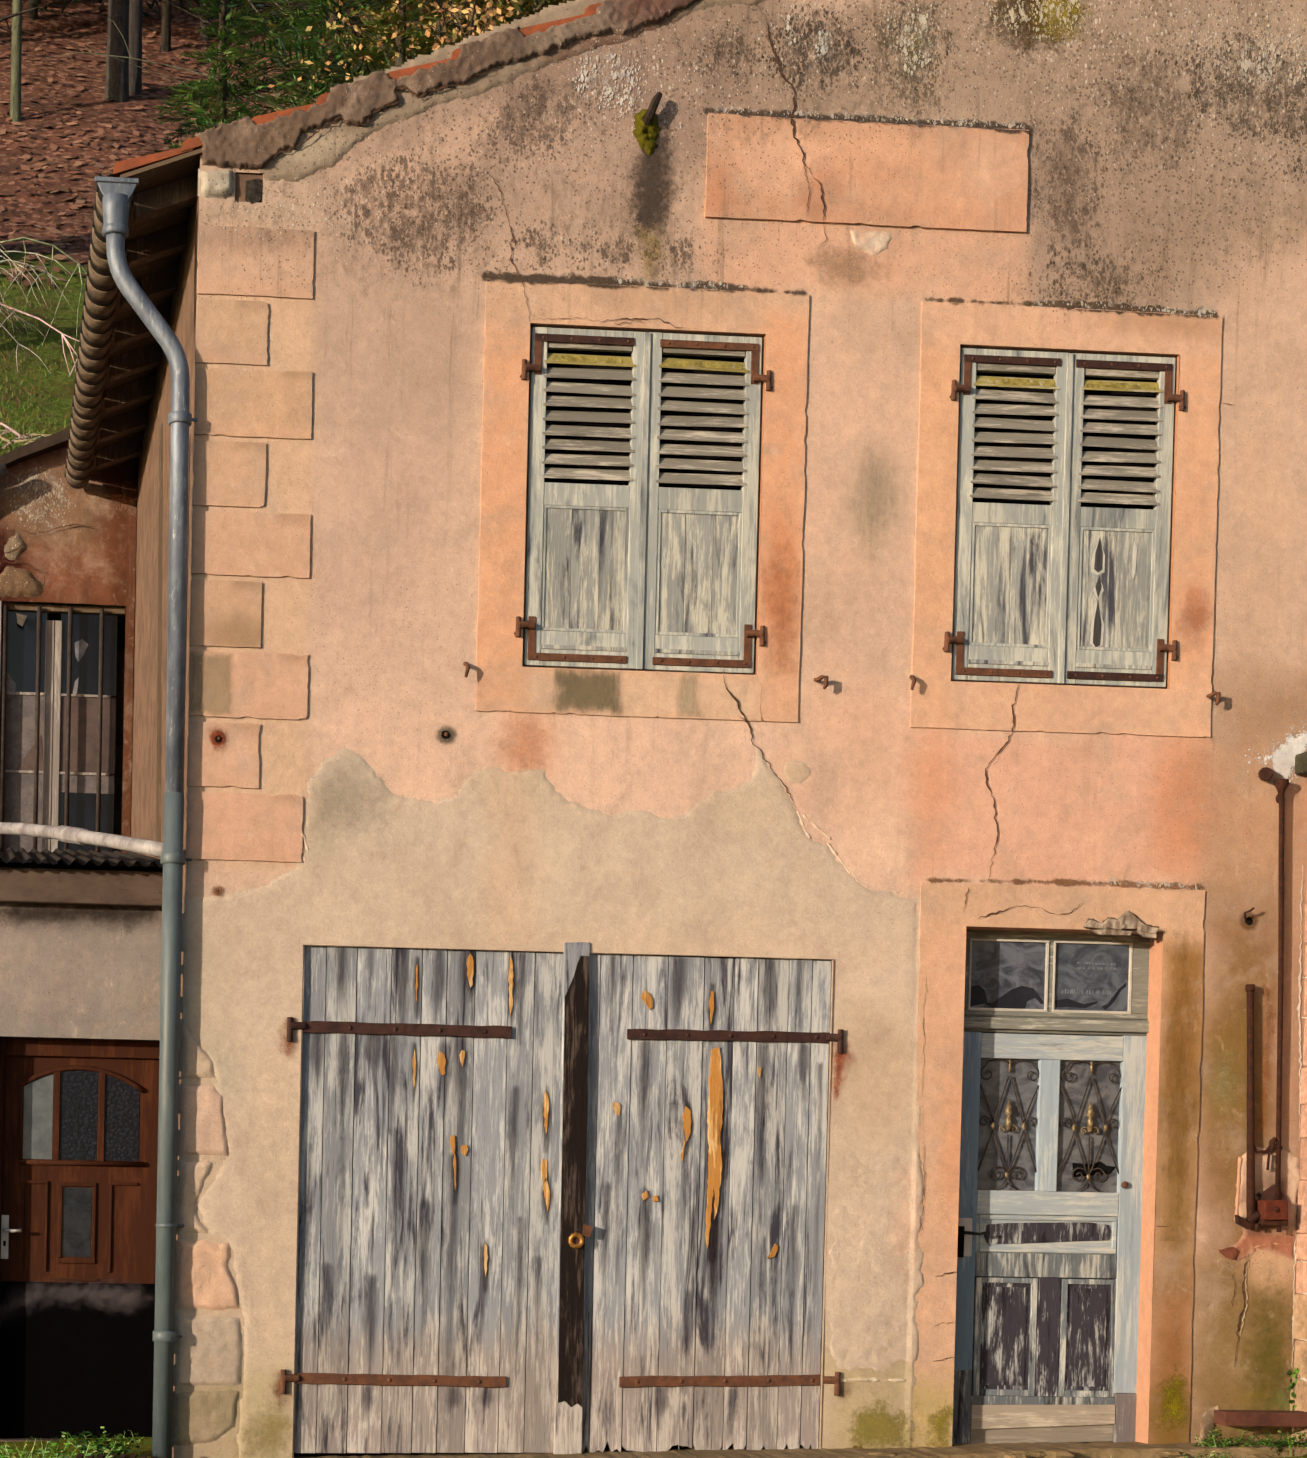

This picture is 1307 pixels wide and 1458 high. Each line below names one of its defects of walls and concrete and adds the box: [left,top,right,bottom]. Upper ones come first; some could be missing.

crack [755,4,827,243]
mould [1168,29,1307,182]
mould [333,148,495,286]
damp [481,128,807,295]
mould [926,245,1219,318]
crack [723,675,795,806]
crack [963,684,1084,919]
damp [1245,720,1307,790]
flaking render [180,745,925,1458]
crack [1231,1257,1250,1367]